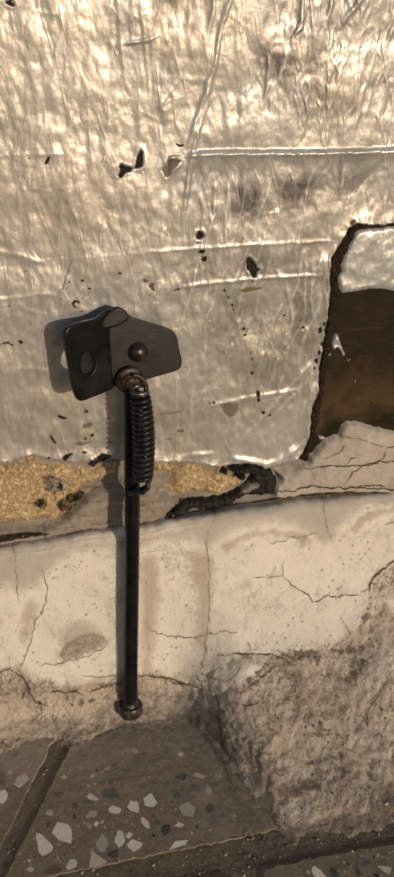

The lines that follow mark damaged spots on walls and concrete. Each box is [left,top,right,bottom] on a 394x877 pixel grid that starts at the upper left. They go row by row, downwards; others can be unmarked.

peeling [118,150,146,178]
peeling [305,322,350,370]
spalling [0,451,116,523]
spalling [154,462,257,494]
crack [270,435,394,544]
crack [253,561,394,637]
crack [0,510,281,804]
crack [329,679,389,774]